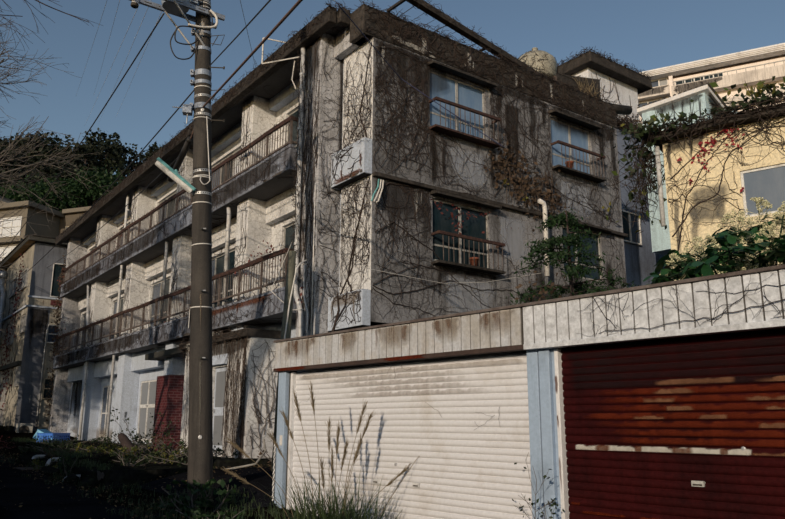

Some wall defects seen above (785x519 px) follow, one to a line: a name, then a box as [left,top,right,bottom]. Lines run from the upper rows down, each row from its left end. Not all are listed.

leakage [488,74,616,177]
leakage [430,134,446,181]
leakage [29,309,48,344]
peeling [635,377,733,419]
corrosion [593,384,785,447]
peeling [749,396,785,409]
peeling [576,445,785,456]